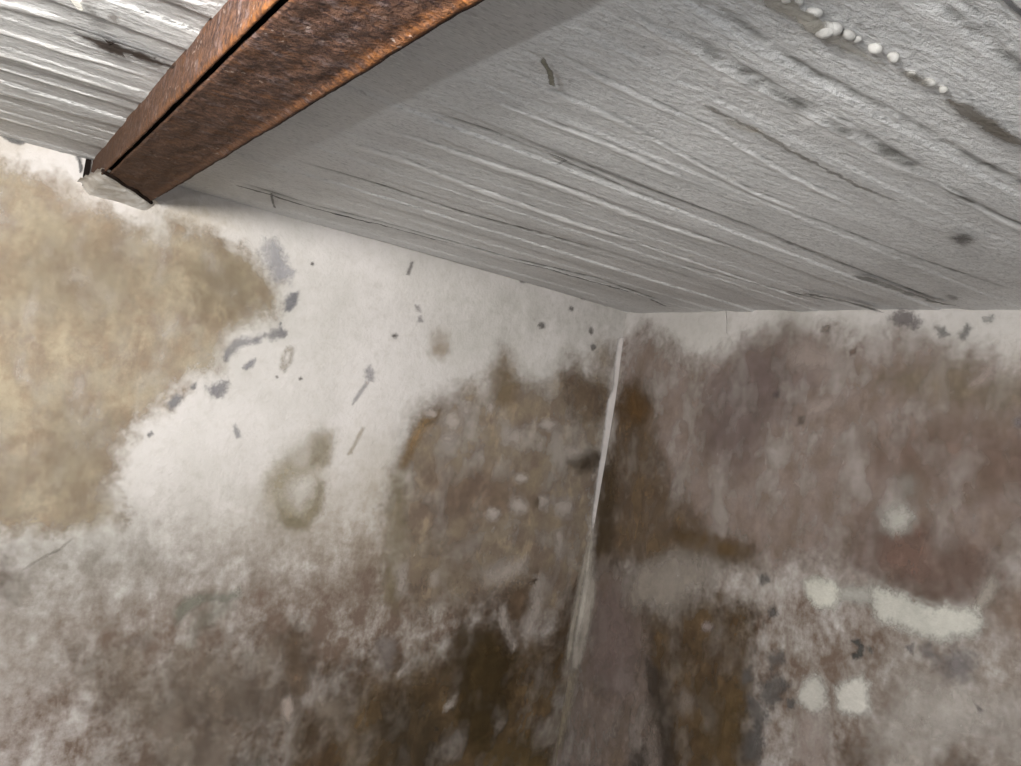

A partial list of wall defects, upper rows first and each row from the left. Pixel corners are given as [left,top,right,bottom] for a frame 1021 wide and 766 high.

damp [0,161,274,531]
damp [96,633,308,766]
damp [290,311,1021,766]